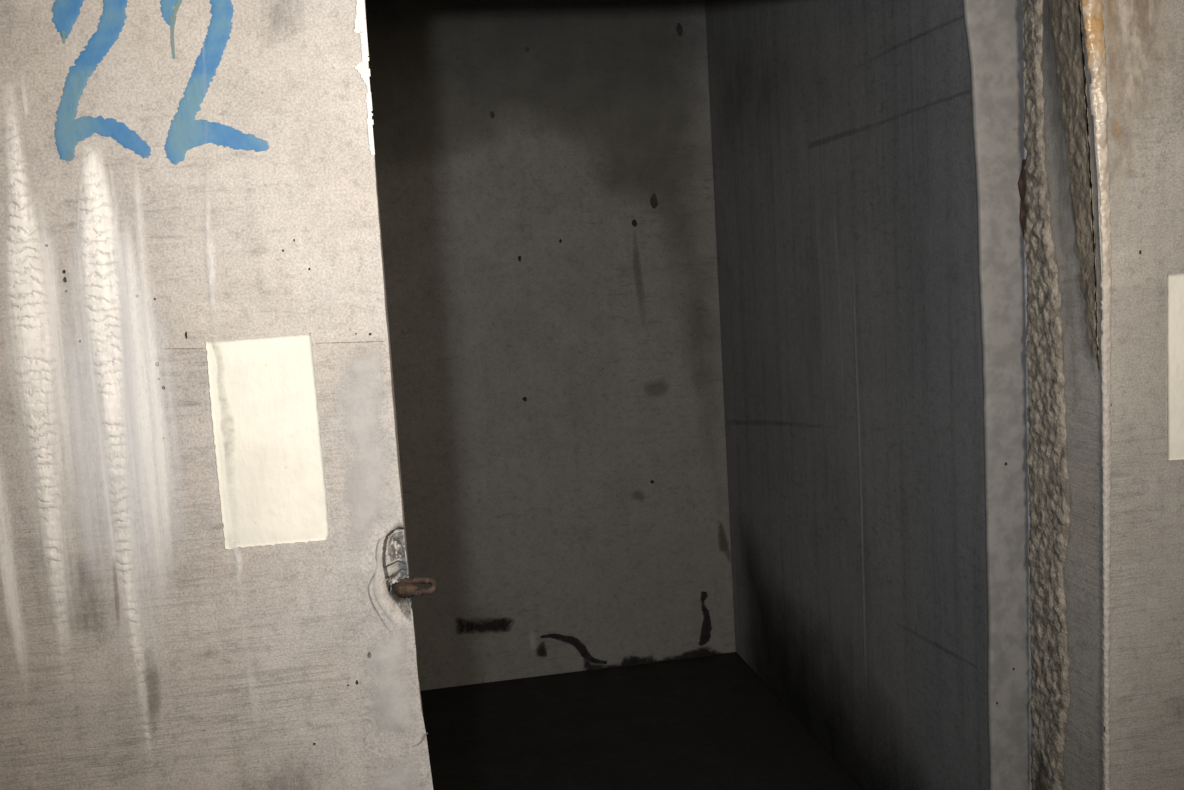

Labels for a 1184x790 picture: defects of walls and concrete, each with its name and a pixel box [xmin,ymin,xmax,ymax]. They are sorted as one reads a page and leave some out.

water stain [0,472,22,654]
water stain [8,86,168,652]
flaking render [1021,0,1100,790]